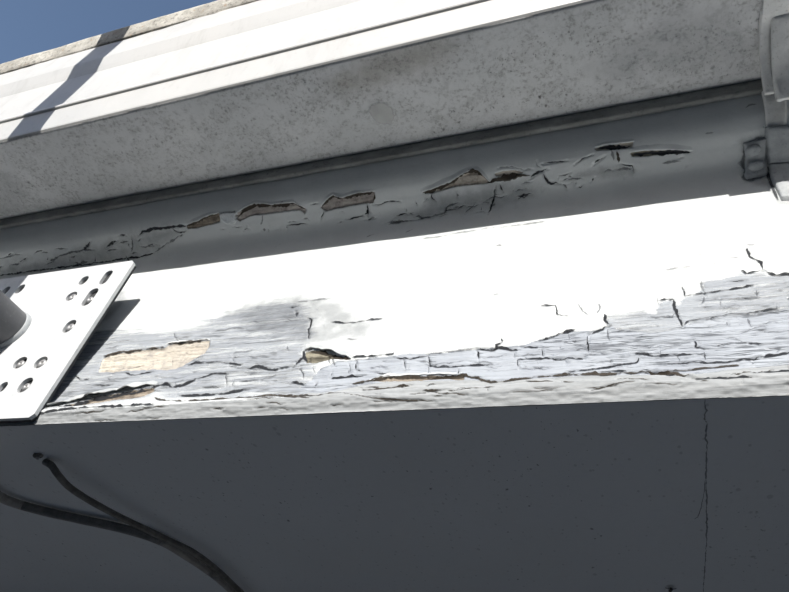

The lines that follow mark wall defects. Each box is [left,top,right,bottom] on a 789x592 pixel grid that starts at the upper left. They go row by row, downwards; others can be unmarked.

peeling [184,199,306,229]
peeling [320,189,376,211]
peeling [421,165,530,194]
peeling [595,139,692,162]
crack [661,248,789,326]
peeling [0,275,789,426]
crack [39,304,789,421]
crack [695,402,708,592]